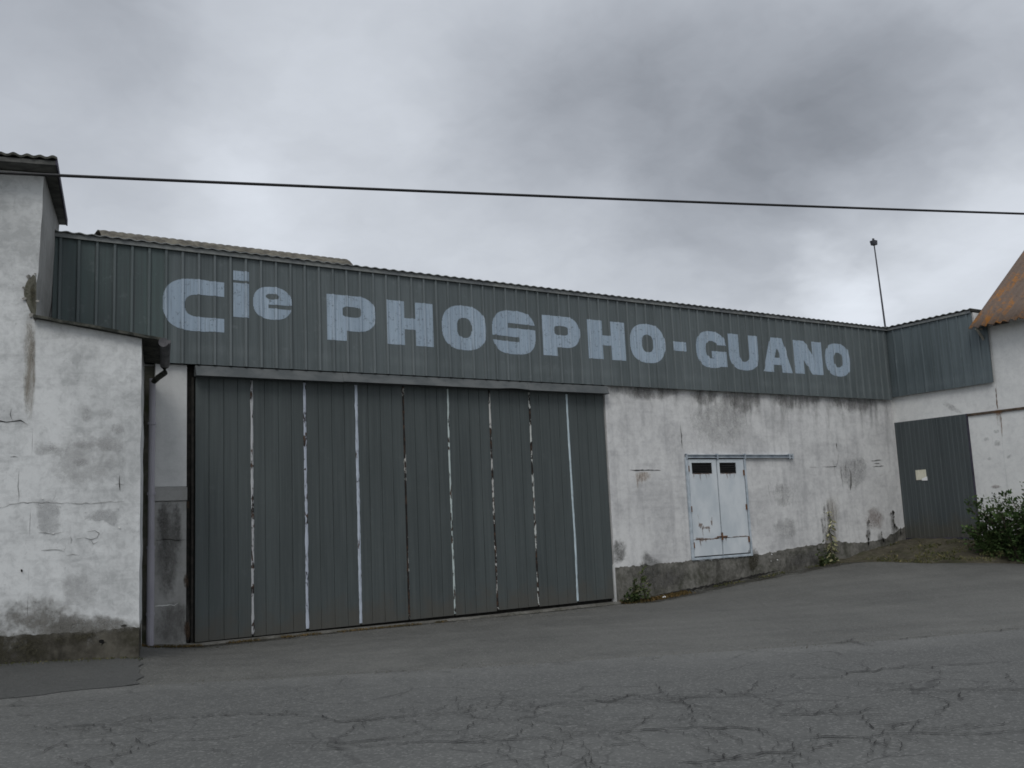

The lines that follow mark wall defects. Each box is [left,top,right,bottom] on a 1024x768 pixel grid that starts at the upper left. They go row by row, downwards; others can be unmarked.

crack [2,456,122,508]